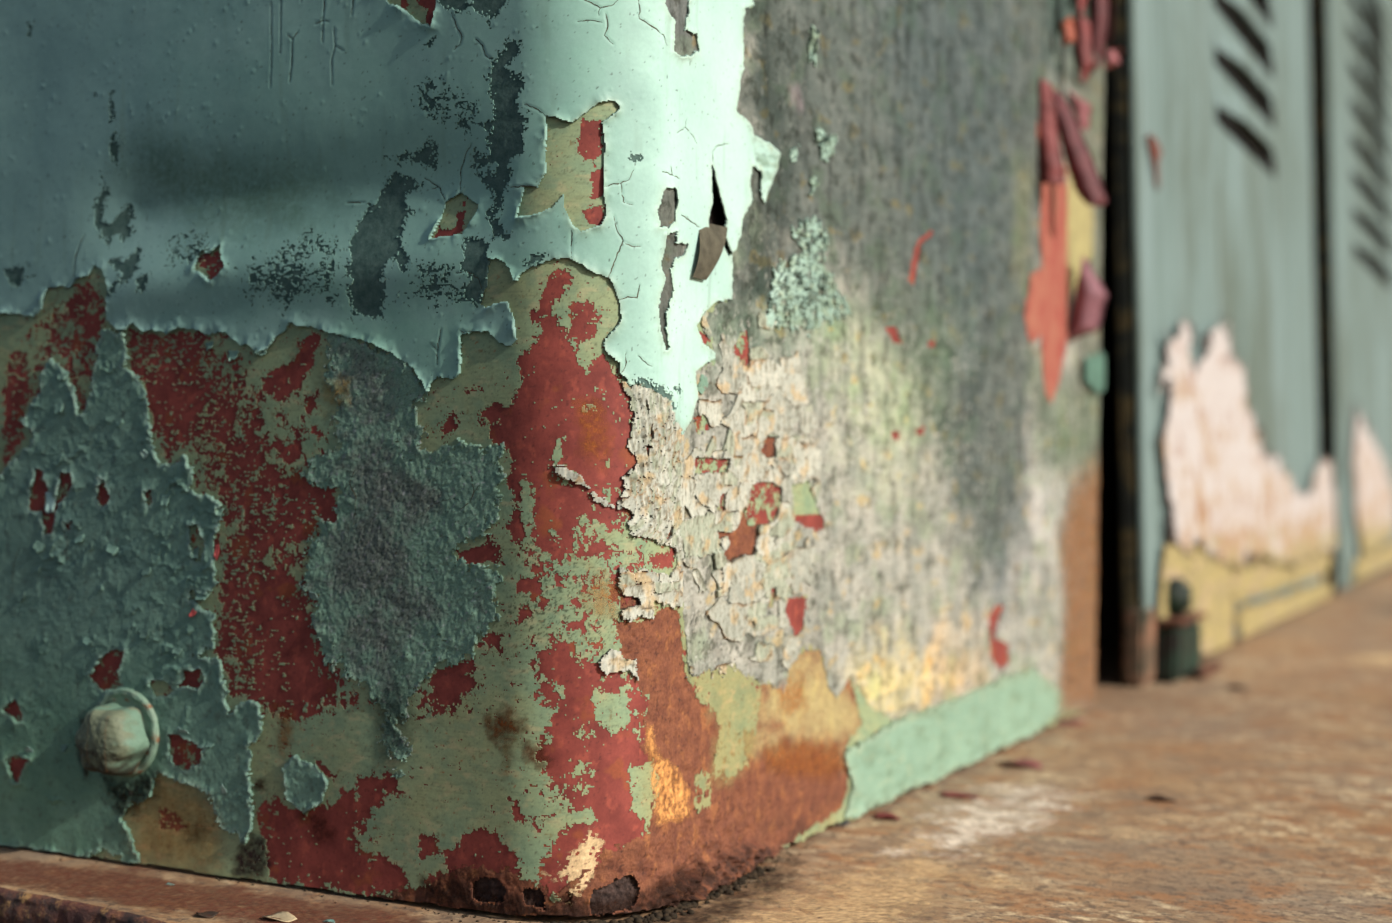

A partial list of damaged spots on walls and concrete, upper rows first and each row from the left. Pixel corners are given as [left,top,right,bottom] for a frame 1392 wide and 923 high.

crack [577,0,666,44]
crack [608,168,679,300]
peeling [0,0,1124,903]
peeling [1157,311,1392,573]
rust [0,588,863,923]
peeling [262,912,297,922]